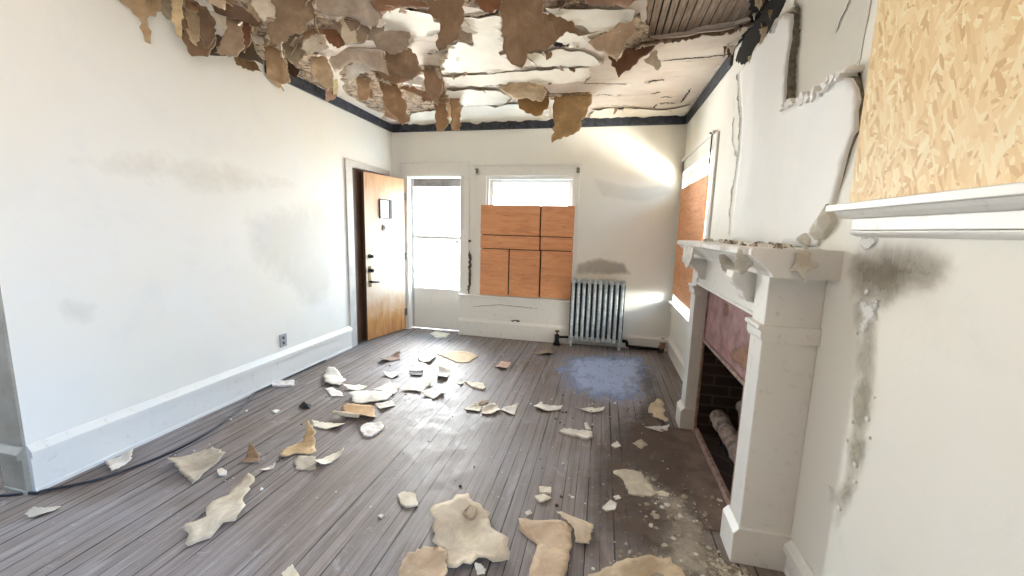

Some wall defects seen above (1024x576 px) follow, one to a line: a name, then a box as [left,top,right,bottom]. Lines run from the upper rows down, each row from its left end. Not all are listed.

peeling [376,8,440,37]
peeling [408,8,636,125]
flaking render [590,0,872,118]
crack [421,32,742,235]
water stain [857,257,936,293]